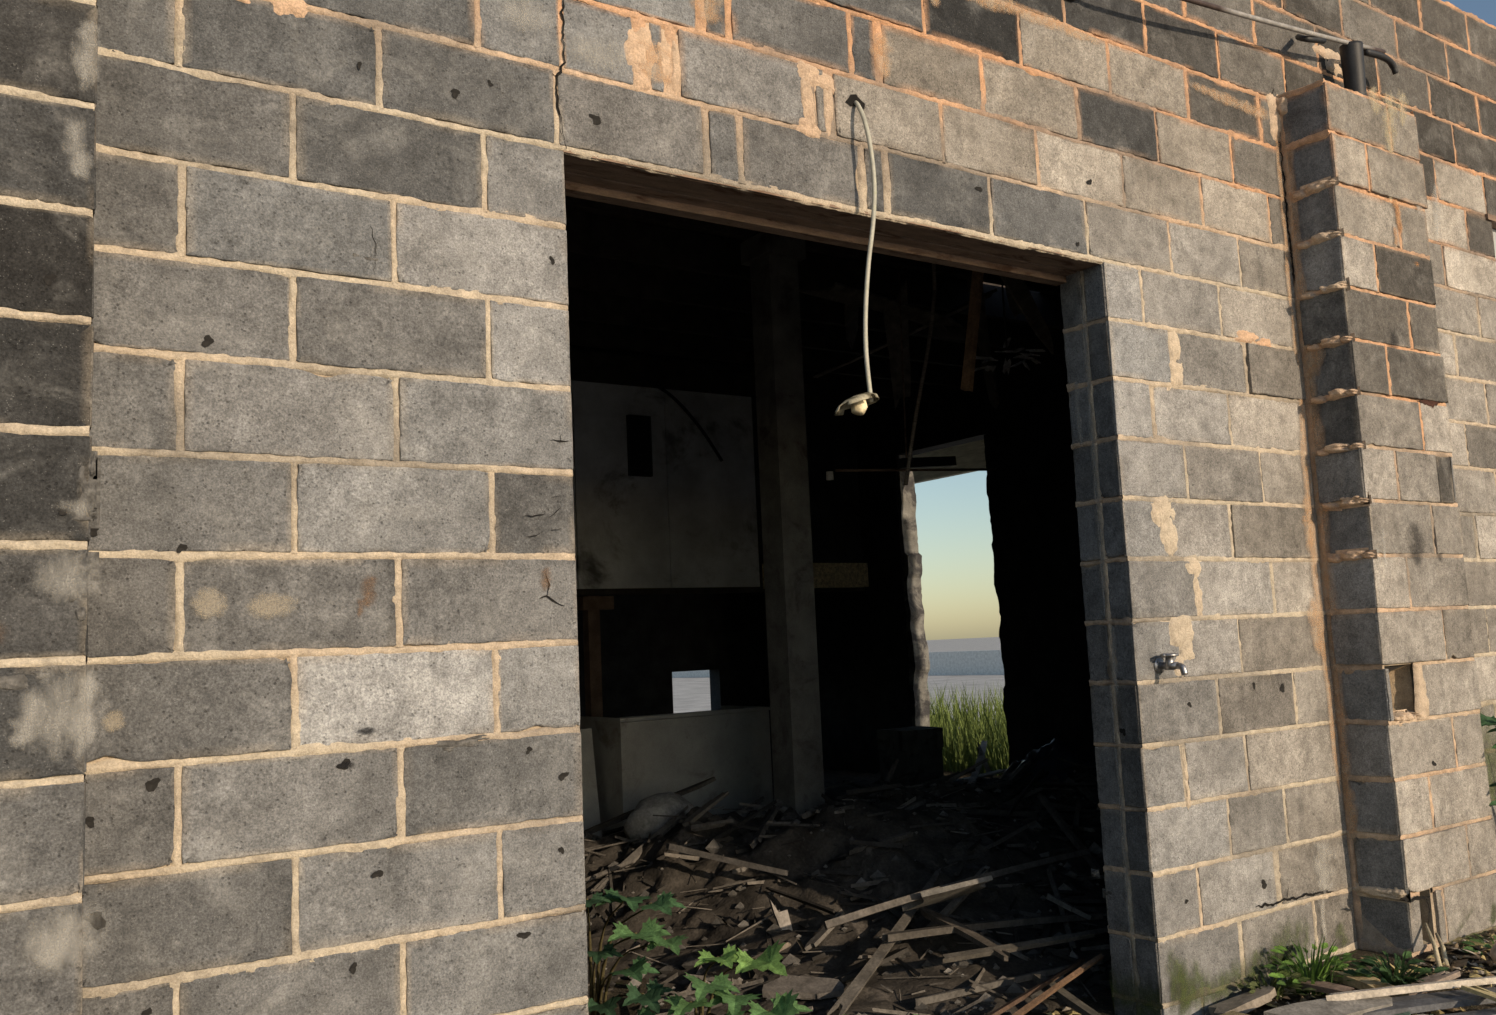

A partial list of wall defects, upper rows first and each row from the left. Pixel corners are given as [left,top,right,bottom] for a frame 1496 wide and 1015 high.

crack [530,0,588,149]
crack [1278,137,1295,287]
crack [1256,888,1333,908]